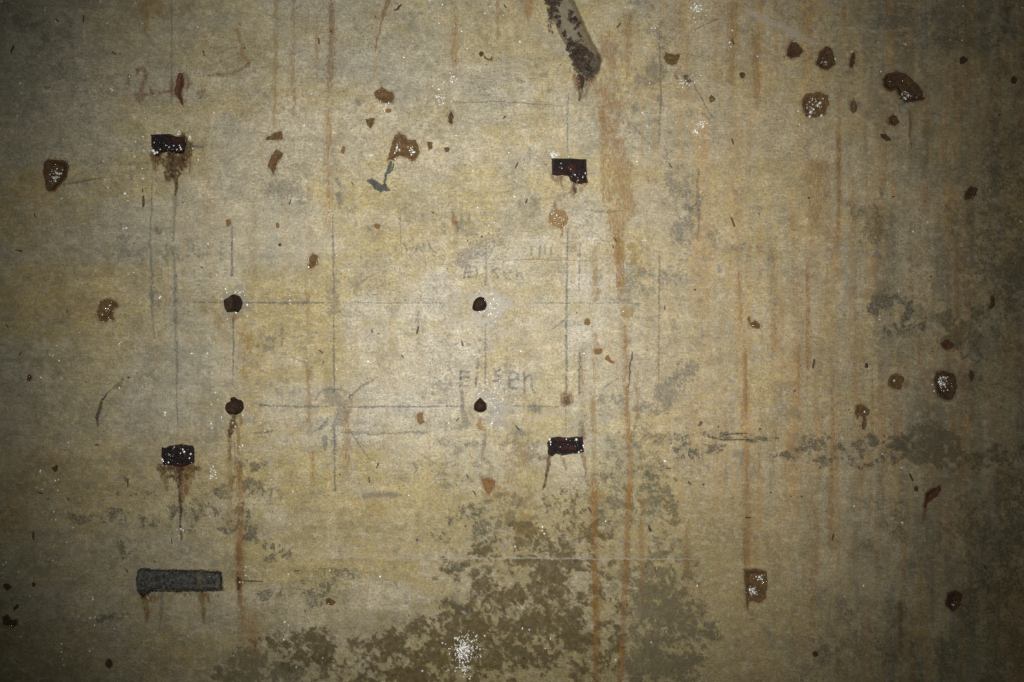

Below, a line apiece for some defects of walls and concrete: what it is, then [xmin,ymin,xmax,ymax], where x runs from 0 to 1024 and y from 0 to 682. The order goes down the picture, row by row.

corrosion [151,133,193,206]
corrosion [525,0,644,287]
corrosion [157,448,199,540]
corrosion [137,568,224,623]
corrosion [228,415,253,647]
water stain [212,432,730,682]
corrosion [539,399,604,680]
water stain [770,422,1023,482]